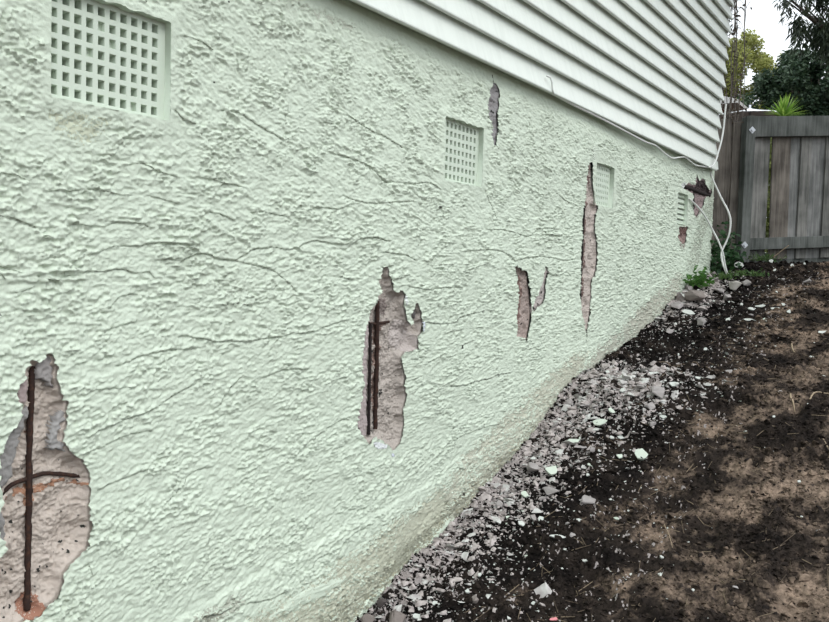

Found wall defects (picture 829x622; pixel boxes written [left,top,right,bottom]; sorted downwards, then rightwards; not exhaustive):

spalling [488,83,499,145]
crack [0,222,415,294]
crack [311,154,434,210]
crack [466,190,573,276]
spalling [580,163,597,331]
spalling [678,225,688,244]
spalling [681,177,712,216]
spalling [515,266,547,340]
peeling [646,276,729,344]
spalling [357,266,426,457]
spalling [0,354,92,622]
peeling [374,360,733,621]